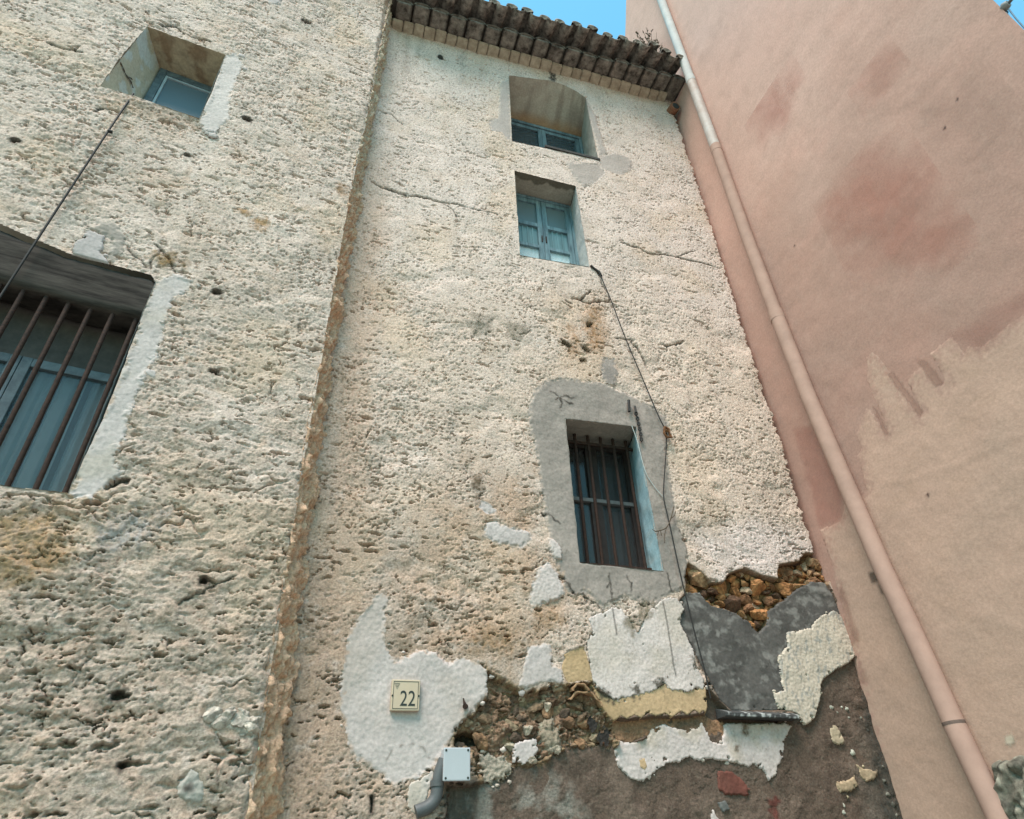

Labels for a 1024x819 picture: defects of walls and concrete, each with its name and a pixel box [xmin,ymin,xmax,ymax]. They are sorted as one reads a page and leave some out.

peeling [527,538,566,612]
flaking render [337,556,903,819]